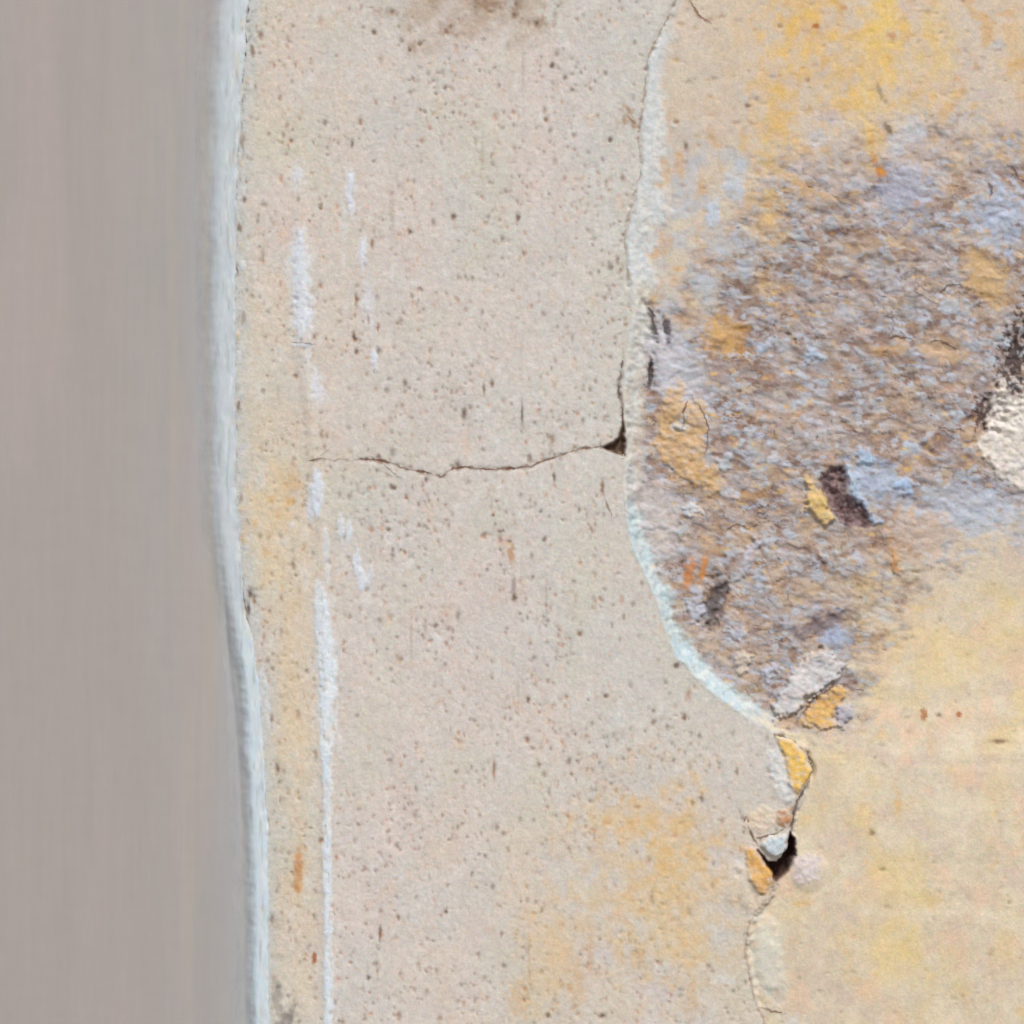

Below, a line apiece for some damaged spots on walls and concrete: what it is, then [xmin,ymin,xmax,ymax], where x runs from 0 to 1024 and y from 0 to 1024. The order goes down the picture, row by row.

crack [309,360,628,479]
crack [602,488,612,516]
spalling [619,19,1024,759]
crack [743,731,826,1024]